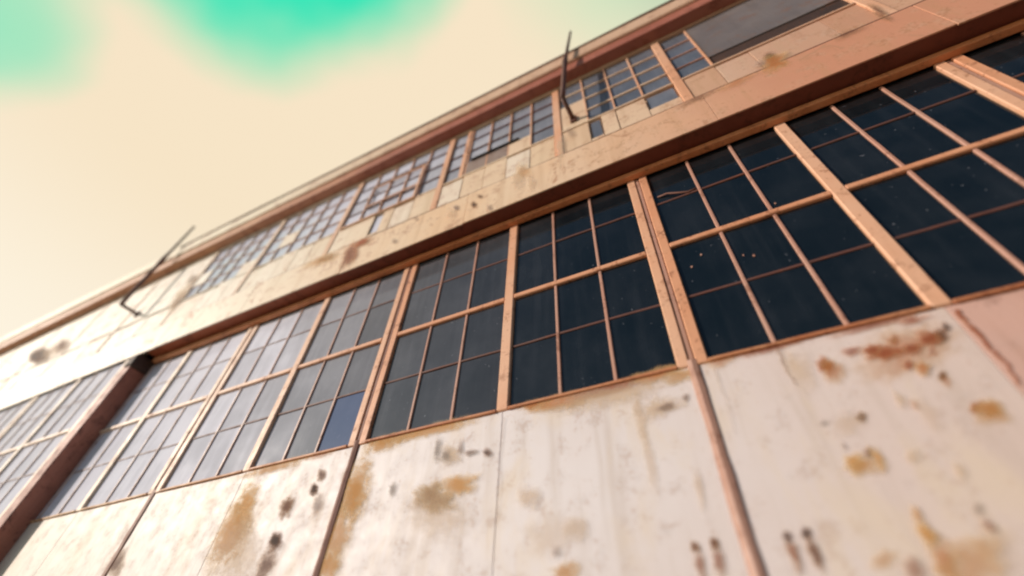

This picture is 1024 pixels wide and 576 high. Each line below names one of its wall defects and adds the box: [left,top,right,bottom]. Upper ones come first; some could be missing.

rust [763,52,787,70]
rust [846,317,949,374]
rust [818,358,837,374]
rust [970,401,1002,416]
rust [845,448,884,472]
rust [691,538,724,575]
rust [783,527,821,569]